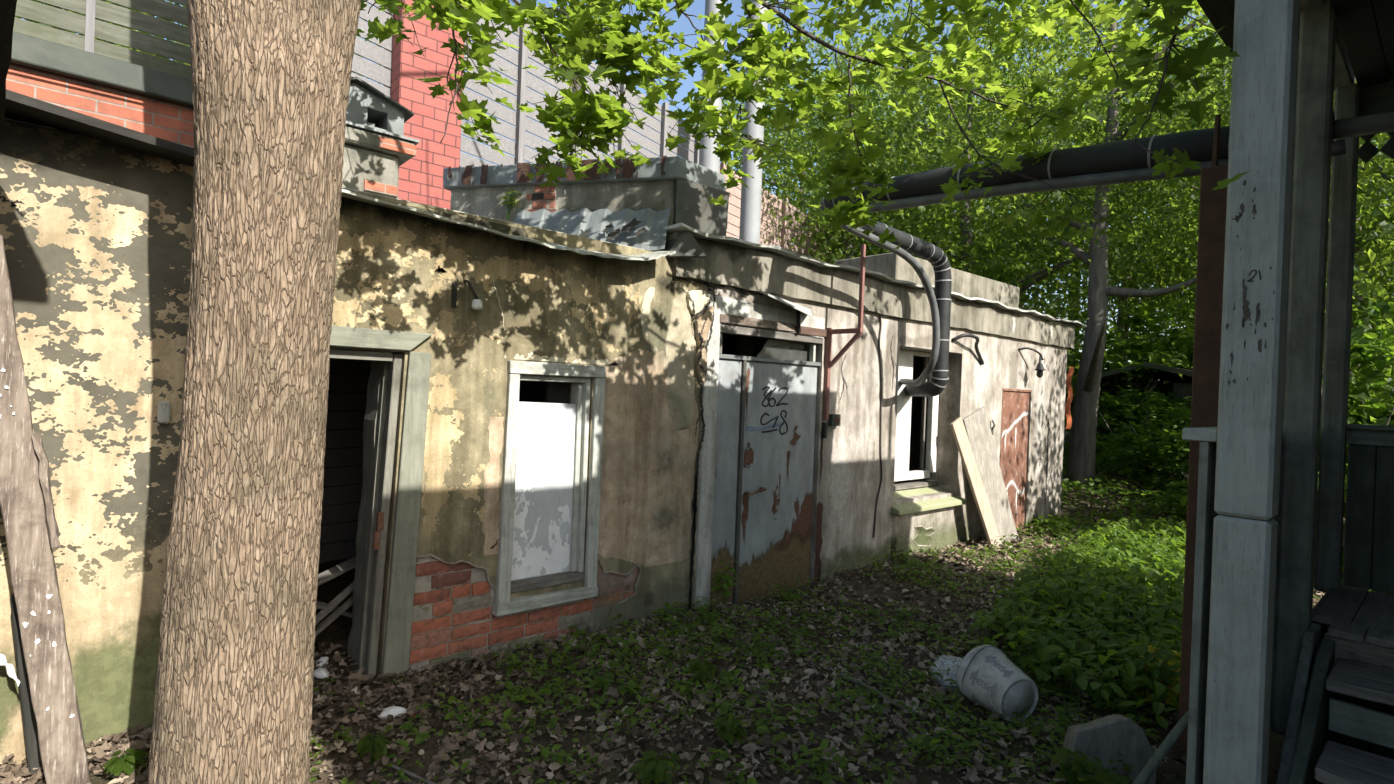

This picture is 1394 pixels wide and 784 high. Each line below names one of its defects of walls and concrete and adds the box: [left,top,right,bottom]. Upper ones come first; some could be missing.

peeling [0,155,194,677]
peeling [332,214,699,672]
crack [677,277,767,611]
rust [710,426,823,607]
peeling [0,702,27,768]